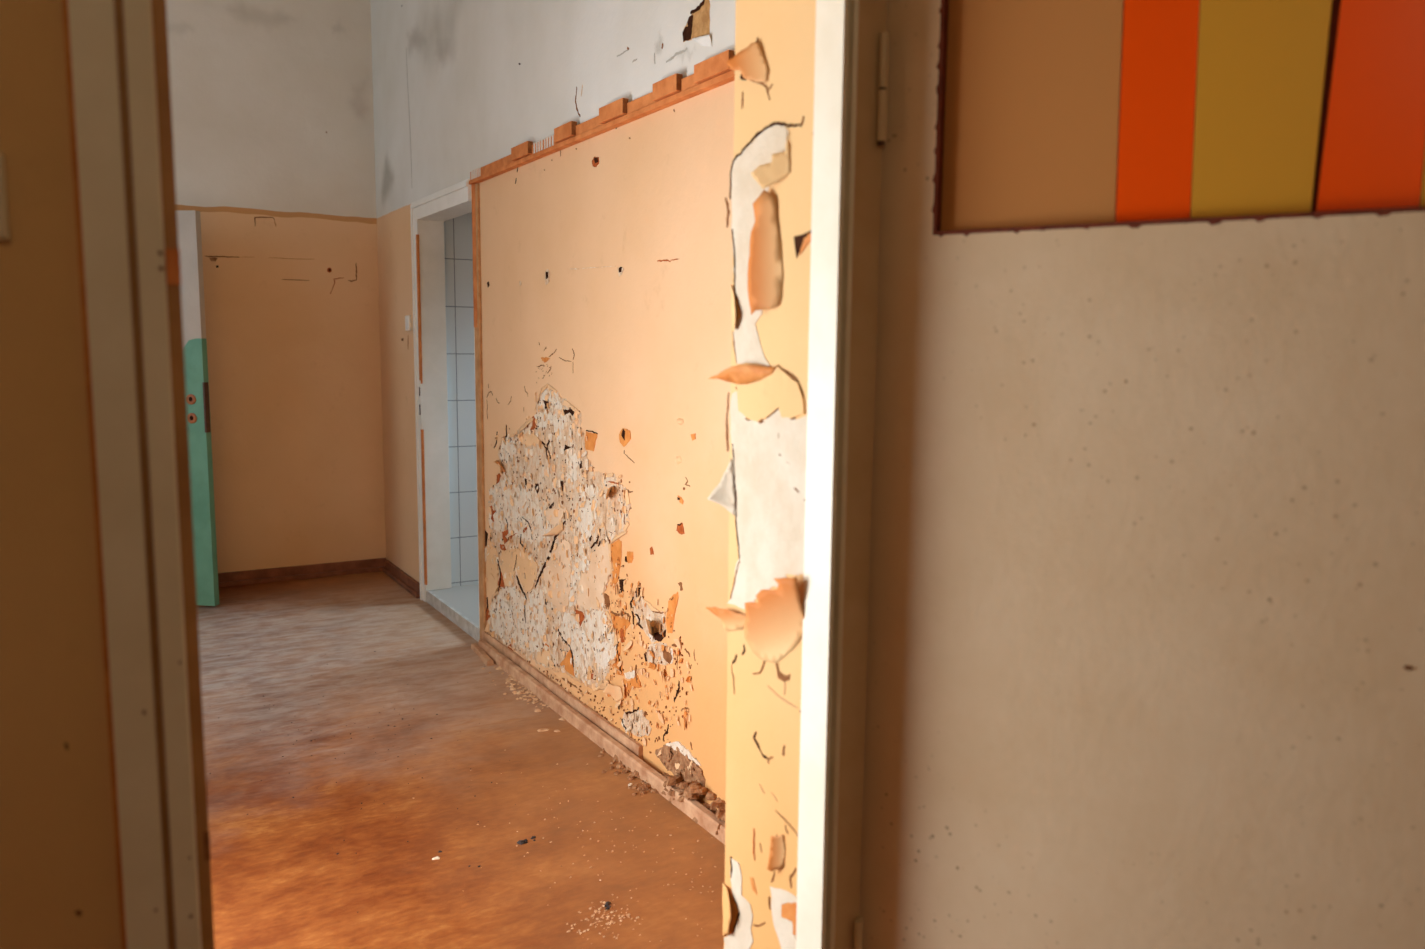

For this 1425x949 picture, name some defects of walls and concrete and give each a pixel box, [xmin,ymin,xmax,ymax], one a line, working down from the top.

flaking render [682,0,712,47]
peeling [726,37,773,109]
peeling [708,116,813,609]
peeling [484,383,706,787]
peeling [775,663,790,695]
peeling [722,856,754,949]
peeling [768,886,797,949]